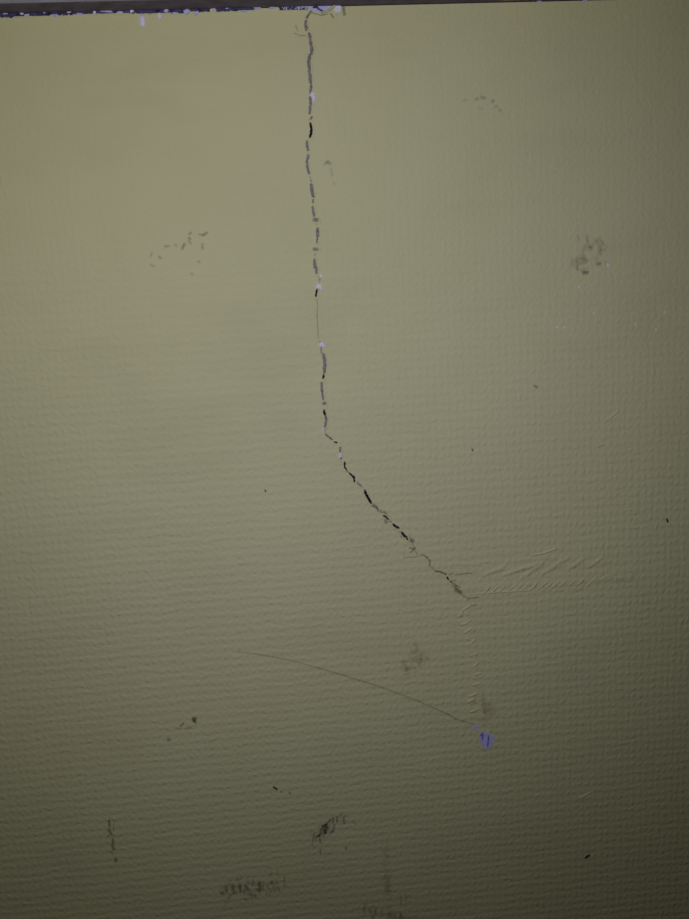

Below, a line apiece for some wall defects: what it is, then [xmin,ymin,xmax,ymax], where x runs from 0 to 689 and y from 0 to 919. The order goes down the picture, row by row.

crack [0,6,322,300]
crack [317,342,411,543]